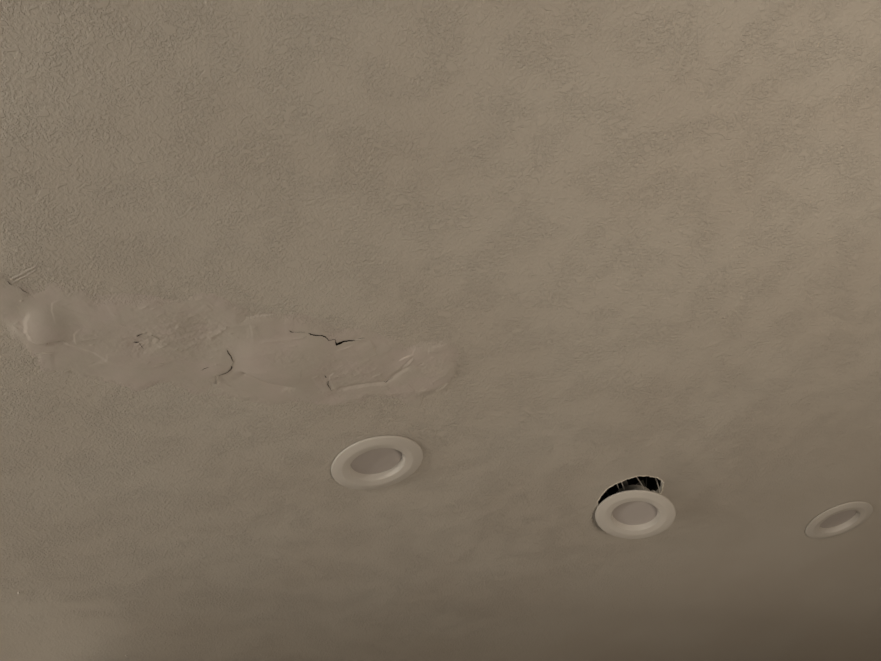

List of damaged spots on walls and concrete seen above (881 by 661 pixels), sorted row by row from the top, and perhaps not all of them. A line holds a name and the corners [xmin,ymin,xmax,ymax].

crack [290,331,361,346]
spalling [597,475,664,507]